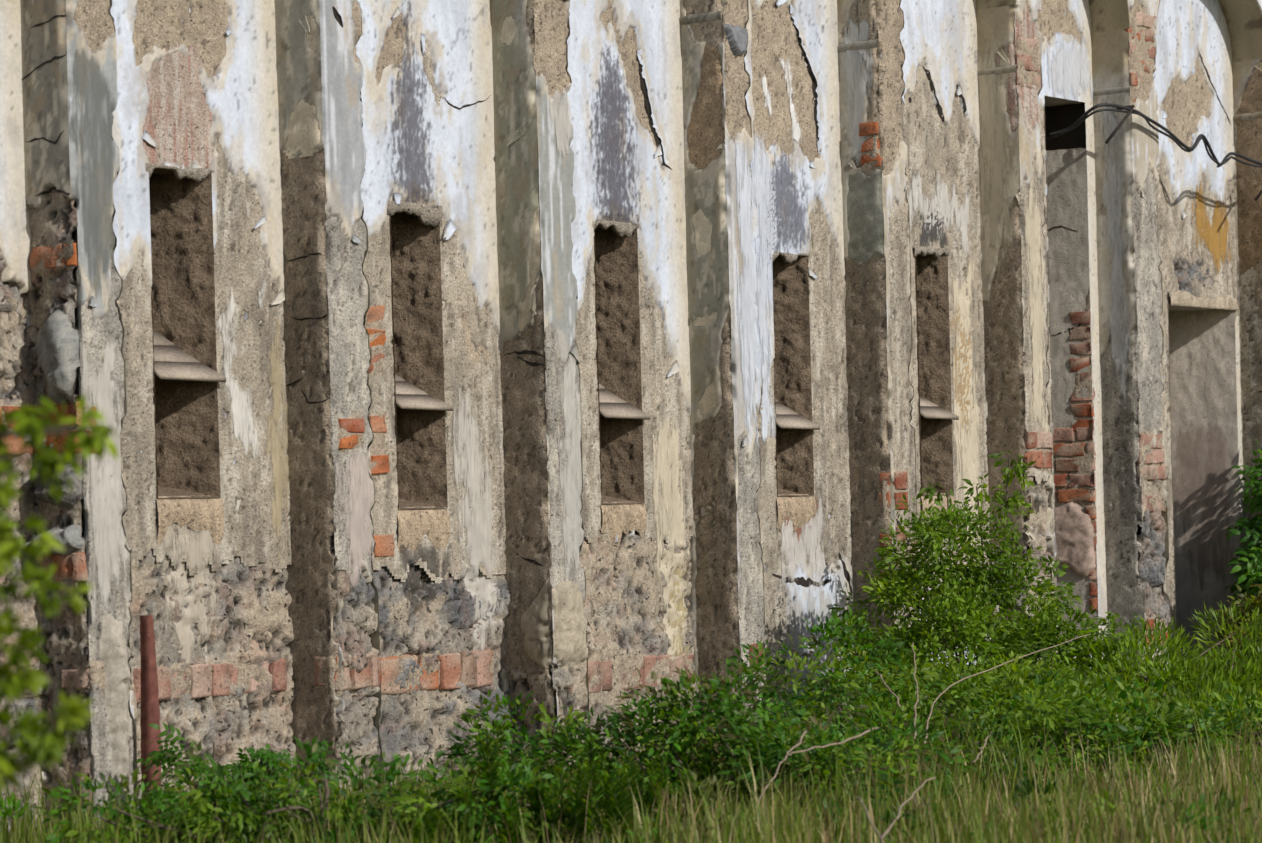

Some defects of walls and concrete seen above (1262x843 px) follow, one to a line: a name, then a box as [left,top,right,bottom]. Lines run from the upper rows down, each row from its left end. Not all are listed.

flaking render [0,0,618,827]
flaking render [588,0,1262,734]